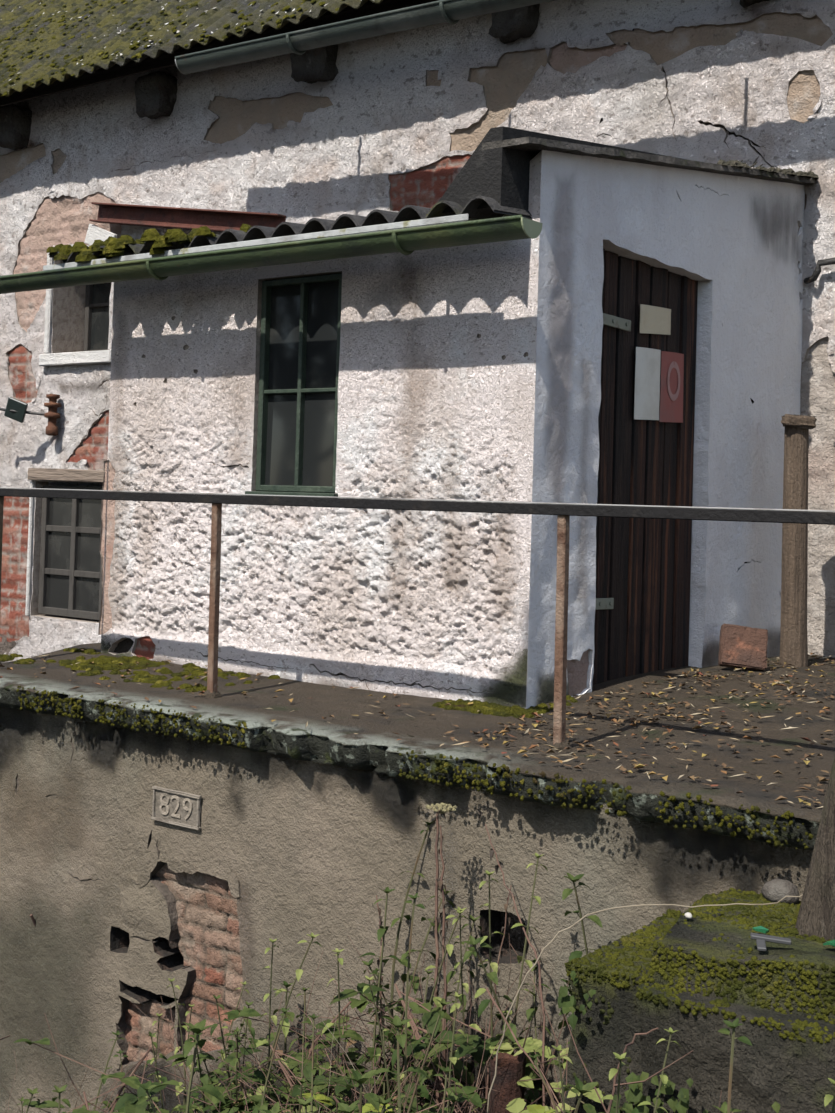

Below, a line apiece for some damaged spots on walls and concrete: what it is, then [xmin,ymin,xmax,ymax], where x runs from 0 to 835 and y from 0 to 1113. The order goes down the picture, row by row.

peeling [389,9,833,211]
crack [700,121,778,168]
spalling [14,191,122,274]
spalling [5,289,46,403]
spalling [800,335,835,511]
peeling [68,410,116,634]
spalling [807,524,835,657]
damp [0,707,38,770]
damp [82,724,211,769]
damp [390,792,415,831]
damp [640,830,770,897]
spalling [112,856,245,1069]